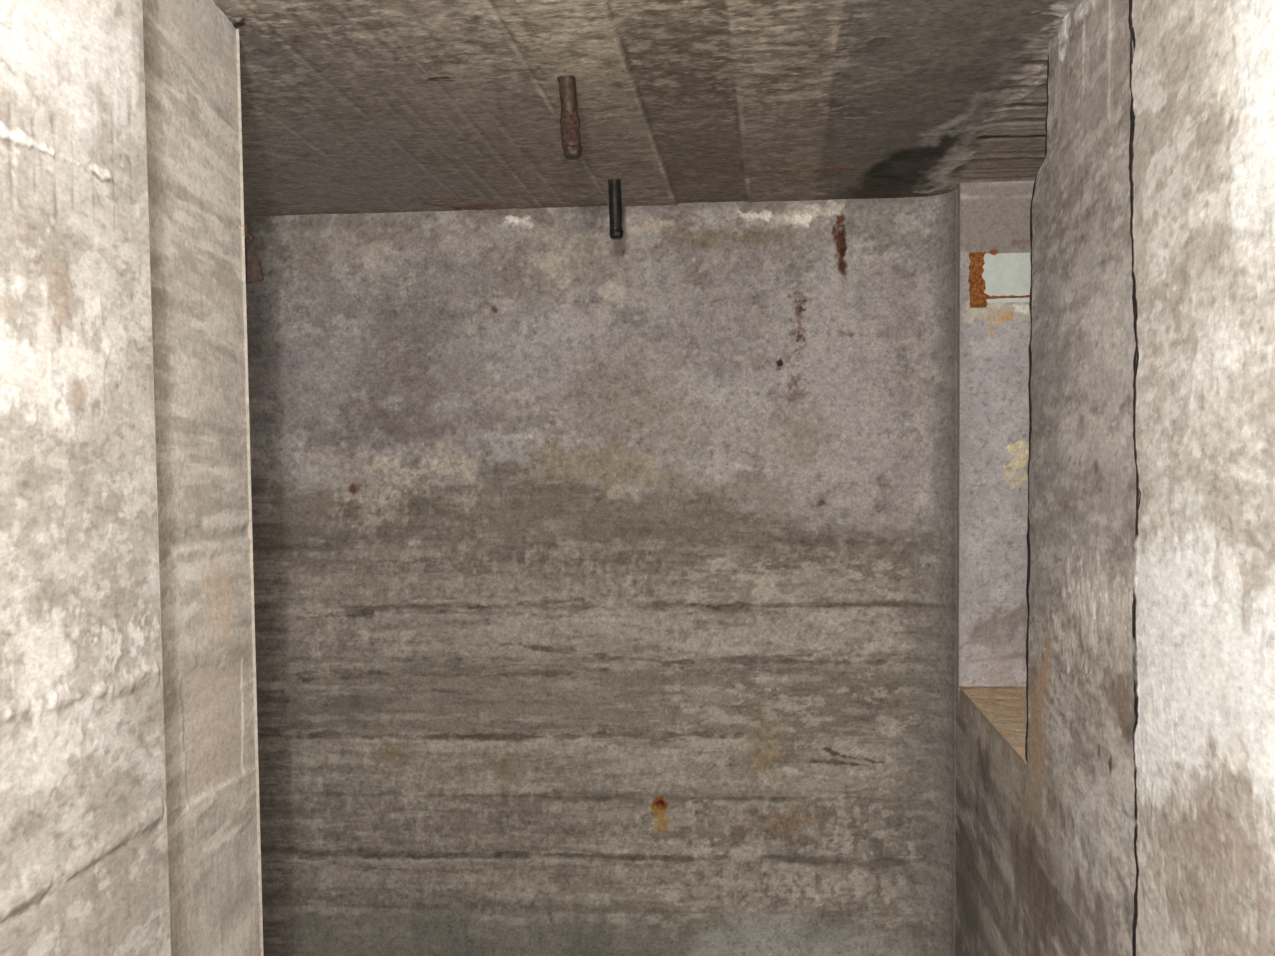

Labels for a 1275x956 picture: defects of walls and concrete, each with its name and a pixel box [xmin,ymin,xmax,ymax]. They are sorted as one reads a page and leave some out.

rust [560,110,581,149]
leakage [791,0,1112,201]
rust [830,213,856,339]
crack [1128,0,1142,537]
rust [758,281,844,474]
crack [1025,49,1050,765]
rust [648,794,673,838]
crack [1132,593,1140,956]